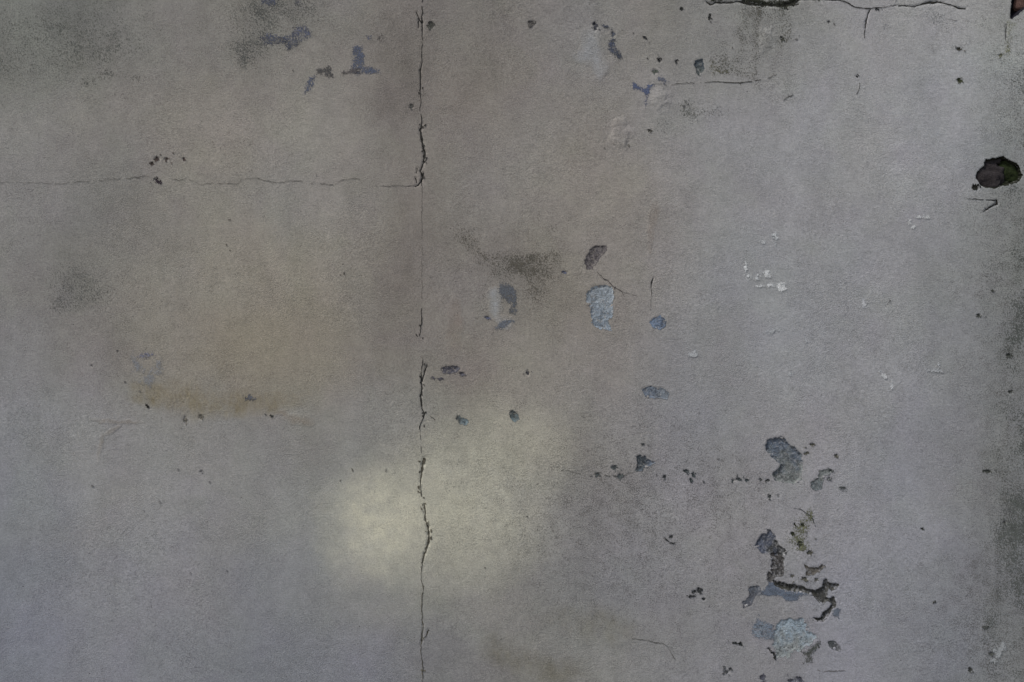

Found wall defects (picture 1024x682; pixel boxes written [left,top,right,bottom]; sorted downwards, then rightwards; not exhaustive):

crack [706,0,799,10]
crack [832,0,966,38]
peeling [305,35,383,95]
peeling [632,57,669,104]
crack [389,0,428,219]
spalling [584,245,607,269]
peeling [485,283,517,330]
spalling [586,284,614,331]
spalling [431,366,465,380]
crack [416,252,435,679]
spalling [731,437,846,500]
spalling [742,523,841,663]